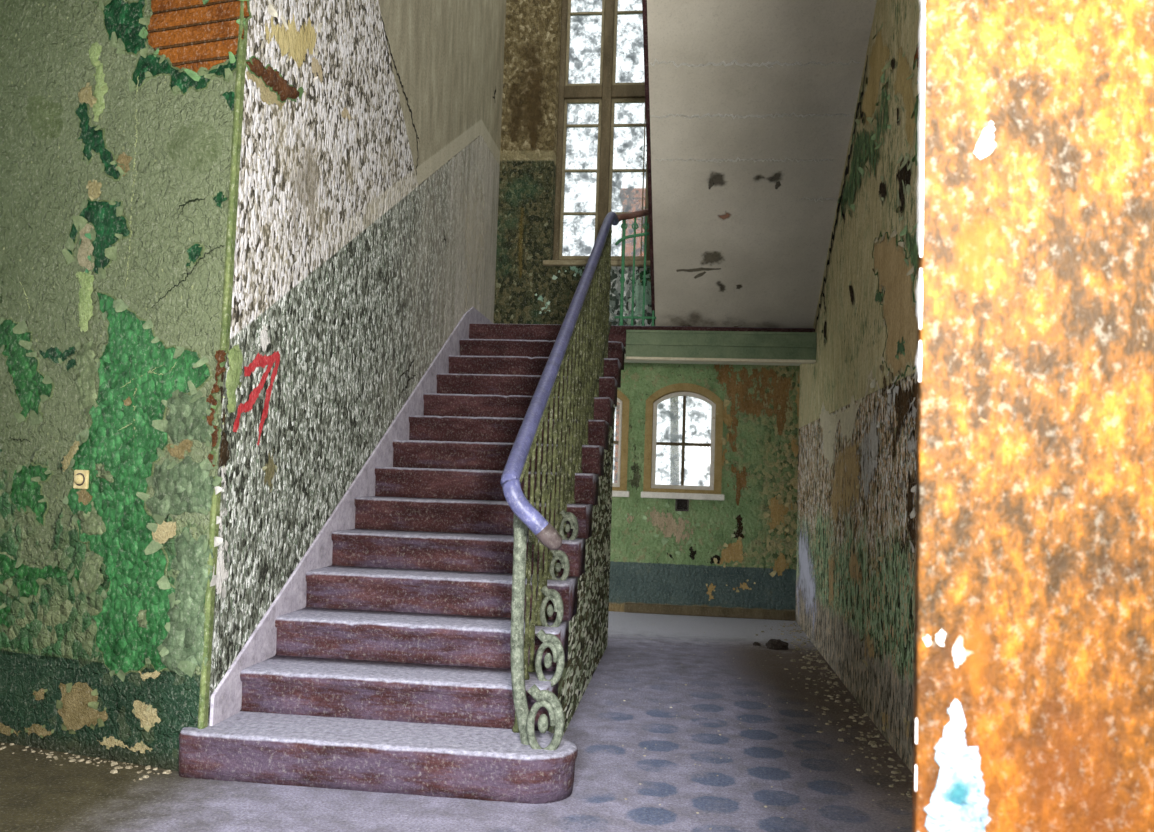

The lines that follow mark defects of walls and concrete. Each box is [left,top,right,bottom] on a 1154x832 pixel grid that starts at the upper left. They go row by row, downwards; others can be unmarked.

spalling [820,23,919,505]
peeling [0,0,325,682]
peeling [627,419,646,490]
spalling [763,373,800,577]
peeling [625,503,700,563]
spalling [710,514,748,567]
spalling [706,579,756,601]
spalling [0,682,161,753]
peeling [917,699,991,832]